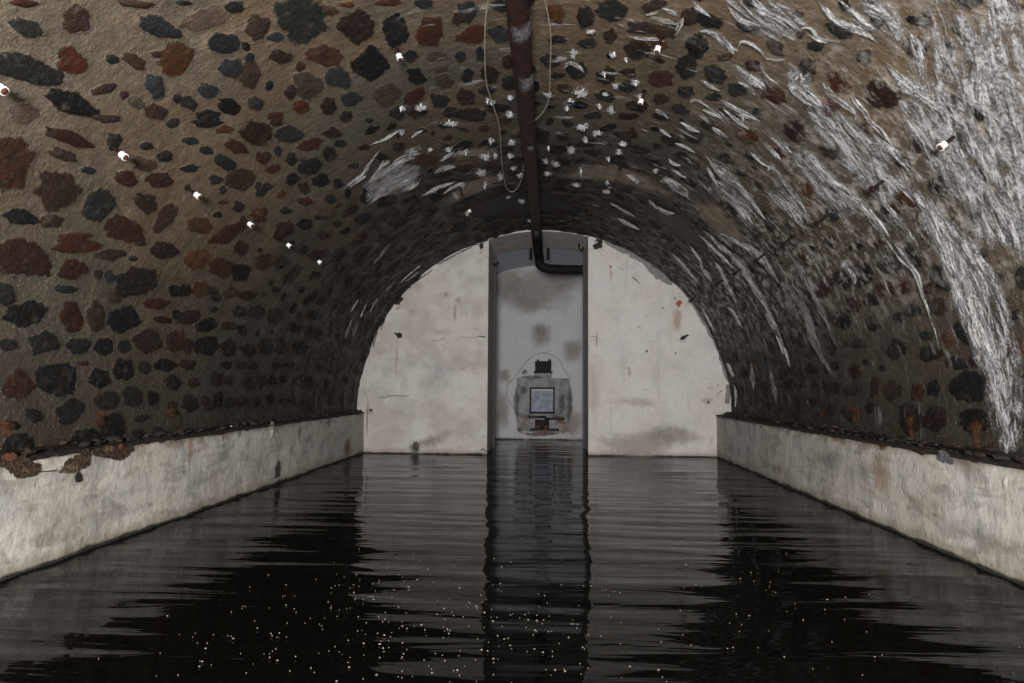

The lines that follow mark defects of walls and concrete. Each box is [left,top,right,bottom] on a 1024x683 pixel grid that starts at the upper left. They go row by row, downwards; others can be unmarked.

leakage [564,49,584,73]
leakage [486,74,554,119]
leakage [544,123,604,176]
leakage [564,87,589,112]
leakage [596,72,642,115]
leakage [655,109,695,153]
leakage [681,80,760,138]
leakage [343,130,581,236]
leakage [653,159,689,199]
leakage [699,0,1024,452]
leakage [647,200,790,366]
spalling [0,443,134,483]